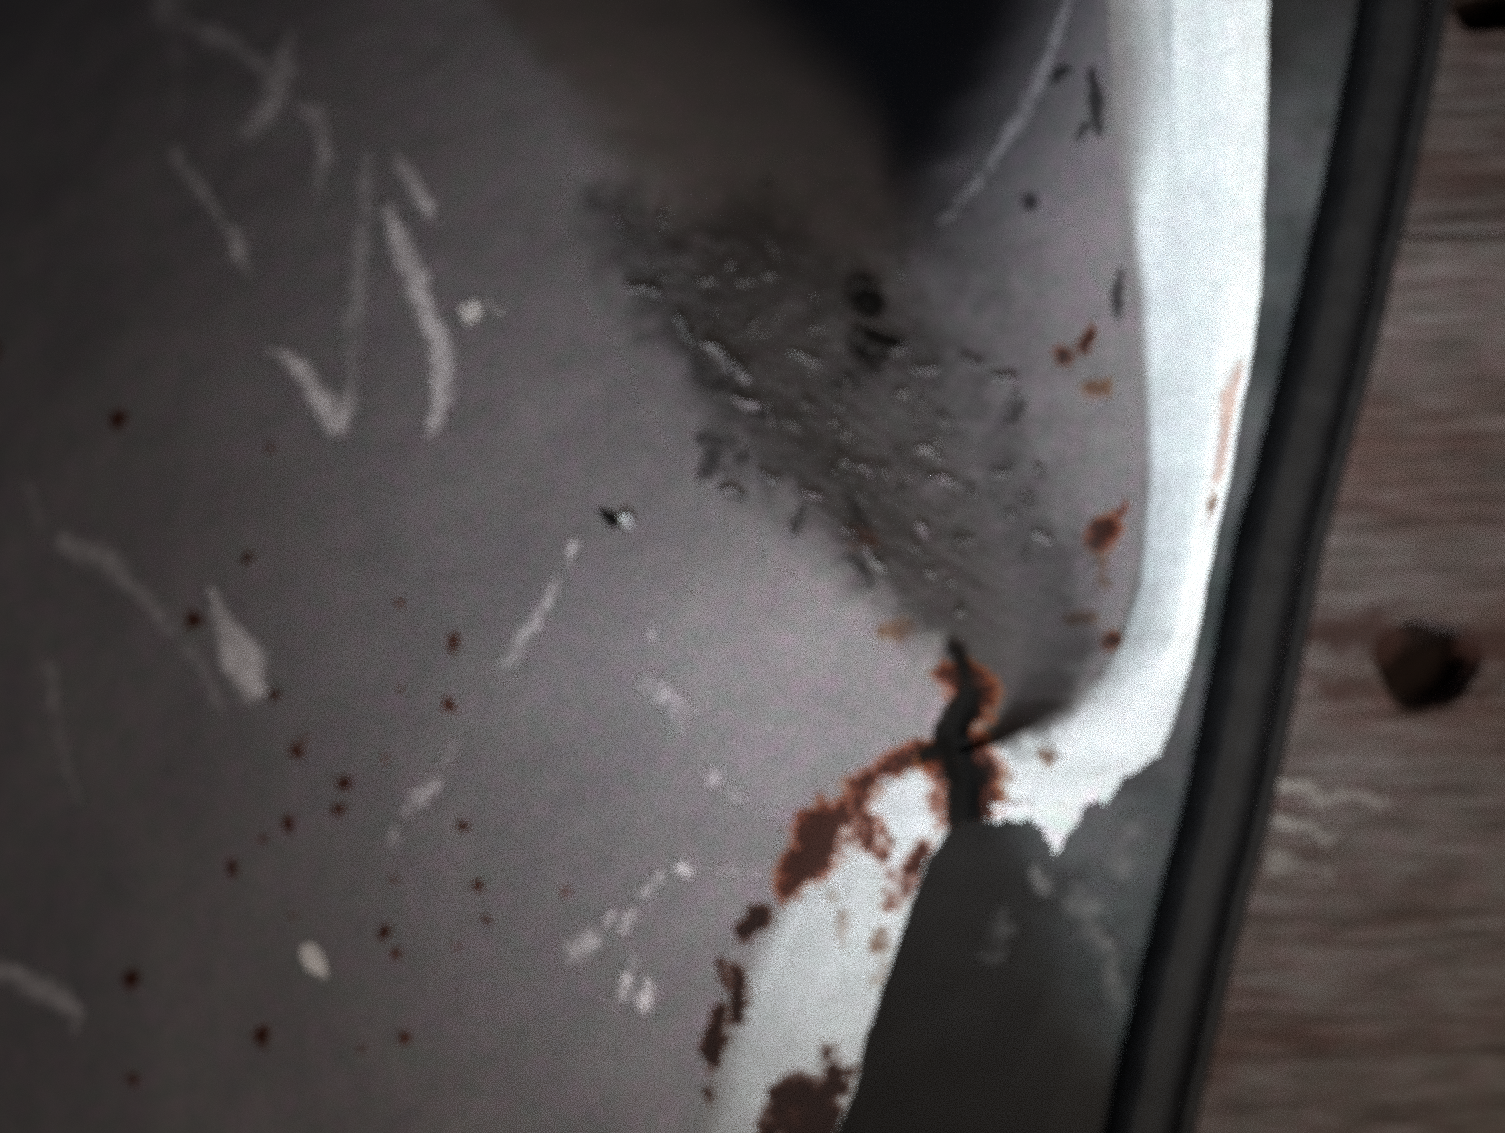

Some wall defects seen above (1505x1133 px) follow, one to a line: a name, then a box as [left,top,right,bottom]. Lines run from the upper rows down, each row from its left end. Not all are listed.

corrosion [931,661,1010,822]
peeling [1040,750,1055,765]
corrosion [734,739,951,945]
peeling [990,760,1131,855]
corrosion [870,929,887,953]
corrosion [698,958,751,1106]
corrosion [756,1046,858,1133]